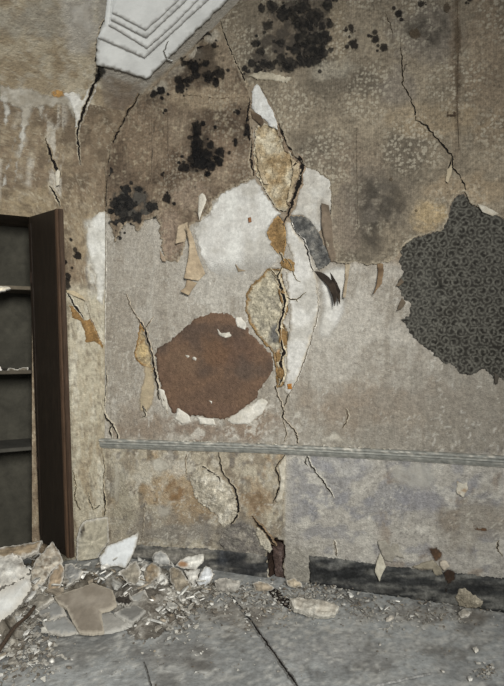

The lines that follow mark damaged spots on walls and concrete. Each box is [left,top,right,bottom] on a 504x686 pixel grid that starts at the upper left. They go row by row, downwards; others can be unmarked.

mould [240,0,338,75]
crack [75,19,105,165]
mould [177,108,252,177]
crack [385,3,466,190]
mould [108,181,176,240]
flaking render [134,71,348,425]
peeling [478,204,499,216]
crack [126,294,168,418]
crack [269,123,335,504]
crack [185,452,277,546]
flaking render [219,521,285,579]
spalling [269,588,292,610]